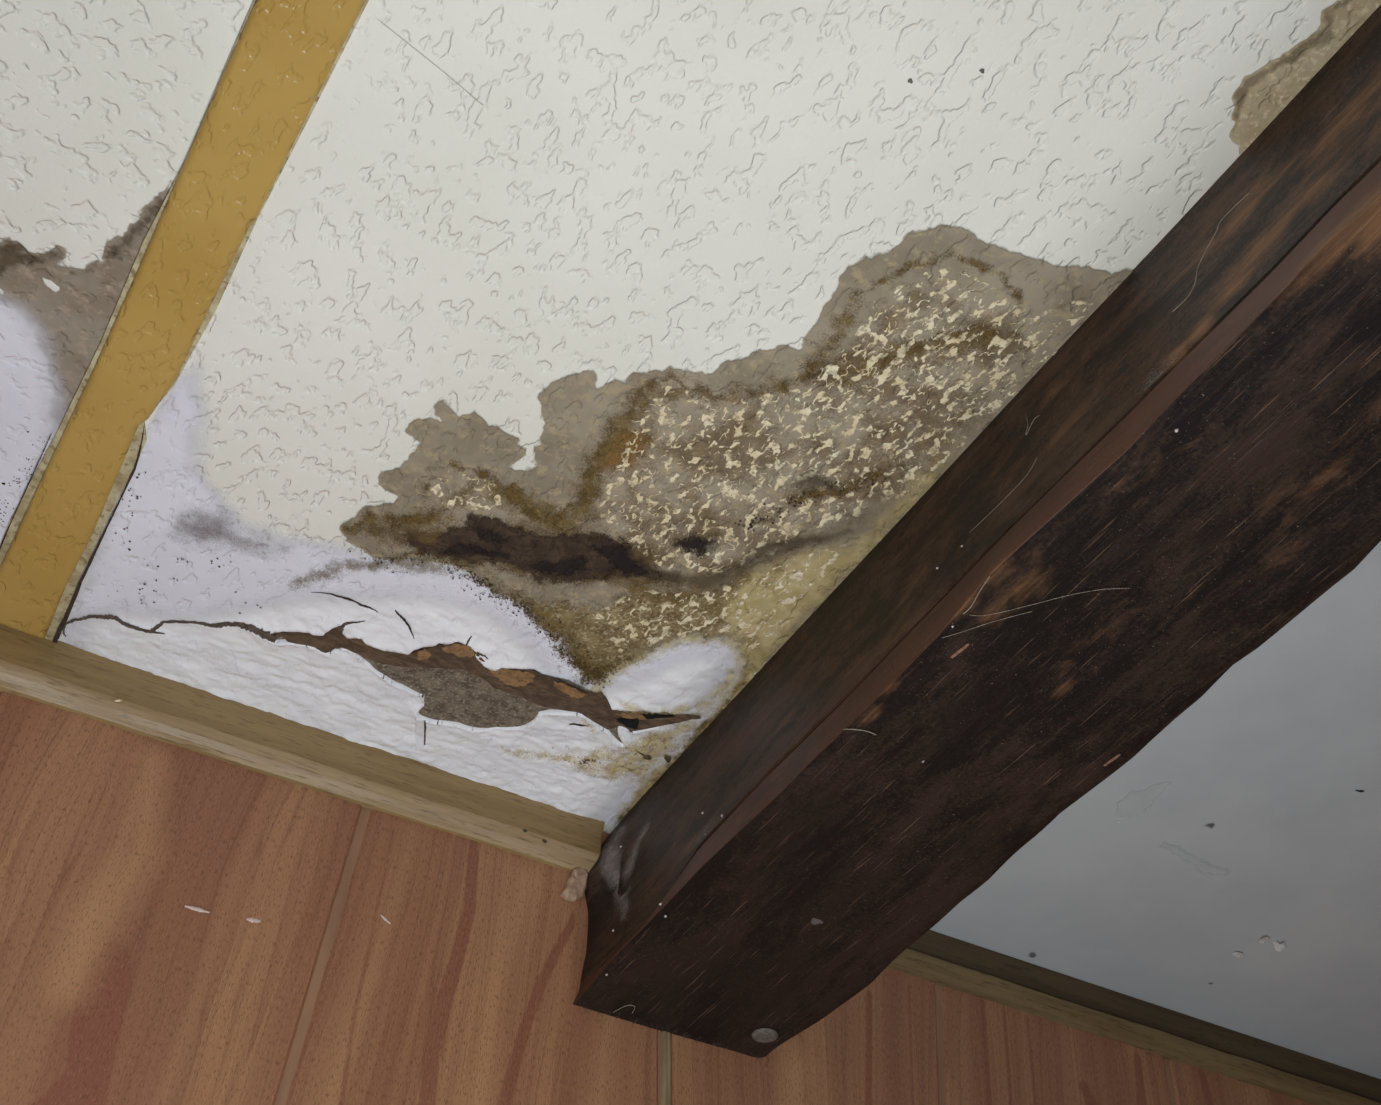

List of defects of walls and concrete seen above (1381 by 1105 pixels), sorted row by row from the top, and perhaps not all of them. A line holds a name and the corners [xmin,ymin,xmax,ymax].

leakage [1230,0,1381,154]
leakage [0,188,169,429]
leakage [183,515,248,543]
leakage [294,225,1133,822]
crack [63,614,277,643]
crack [311,592,414,638]
flaking render [272,621,701,749]